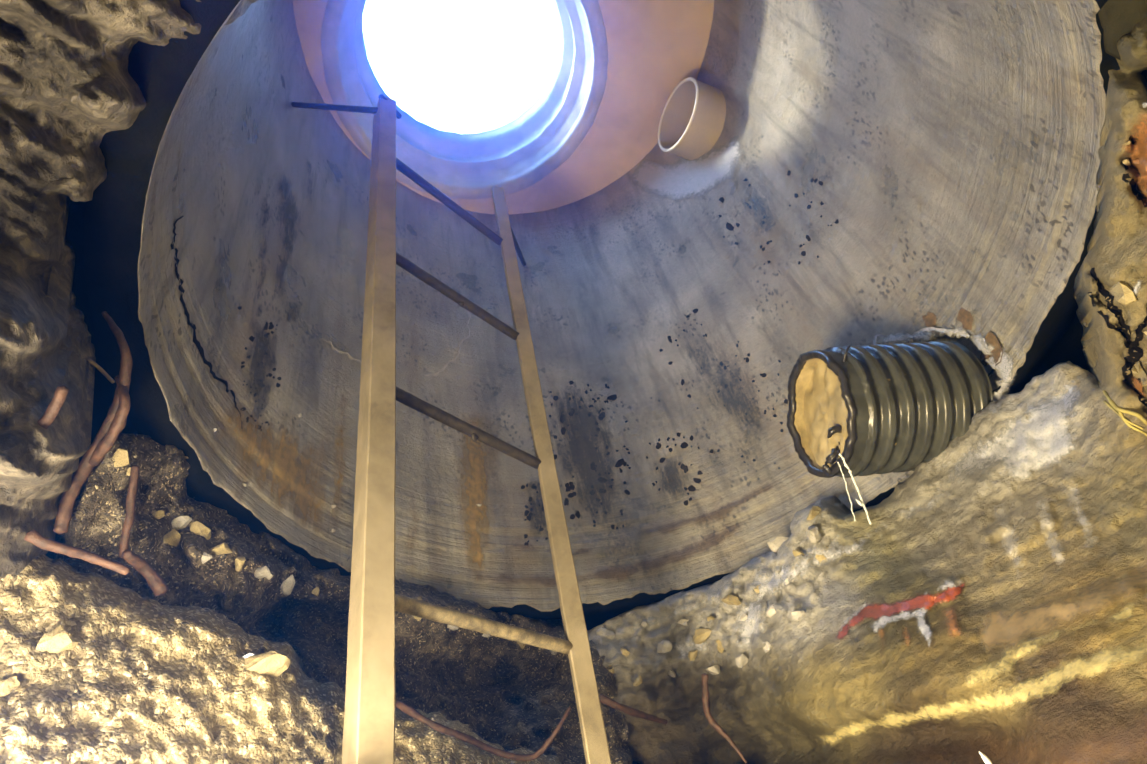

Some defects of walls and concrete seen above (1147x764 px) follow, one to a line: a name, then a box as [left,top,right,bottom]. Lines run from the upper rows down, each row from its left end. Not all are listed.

crack [170,216,243,429]